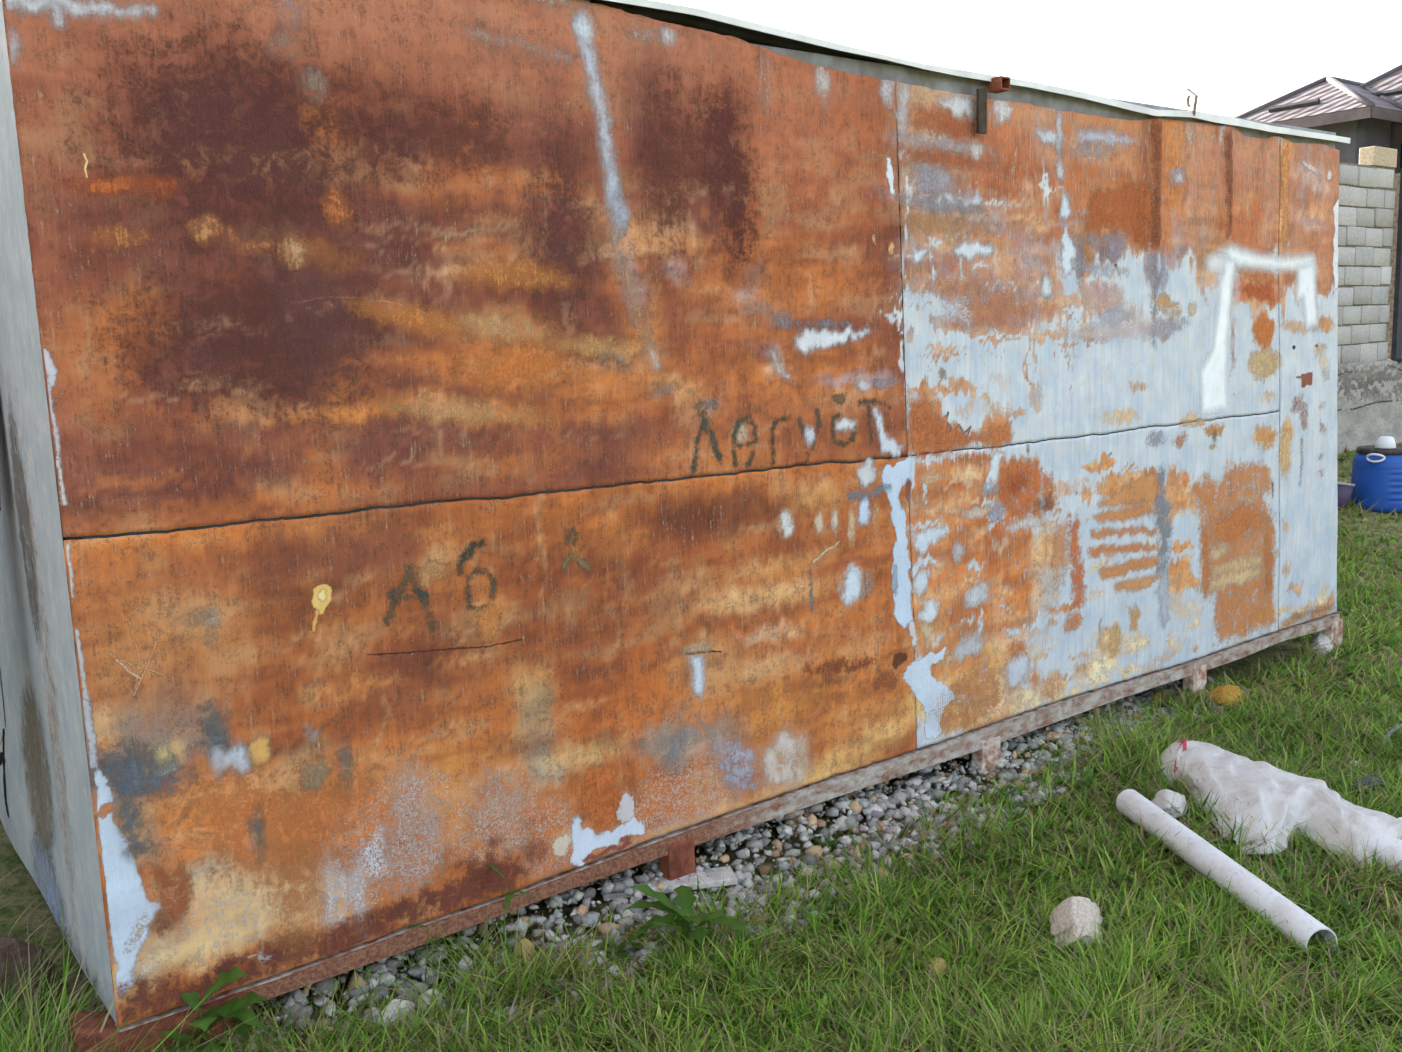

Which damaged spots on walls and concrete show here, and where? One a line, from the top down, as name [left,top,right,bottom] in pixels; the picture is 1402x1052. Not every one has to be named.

corrosion [77,36,652,424]
corrosion [644,73,757,263]
peeling [886,157,895,196]
peeling [937,95,974,123]
peeling [1037,110,1076,298]
peeling [43,348,67,506]
peeling [962,452,1042,531]
corrosion [805,652,907,692]
corrosion [23,686,68,941]
peeling [75,628,162,998]
corrosion [98,747,548,1023]
corrosion [579,763,632,862]